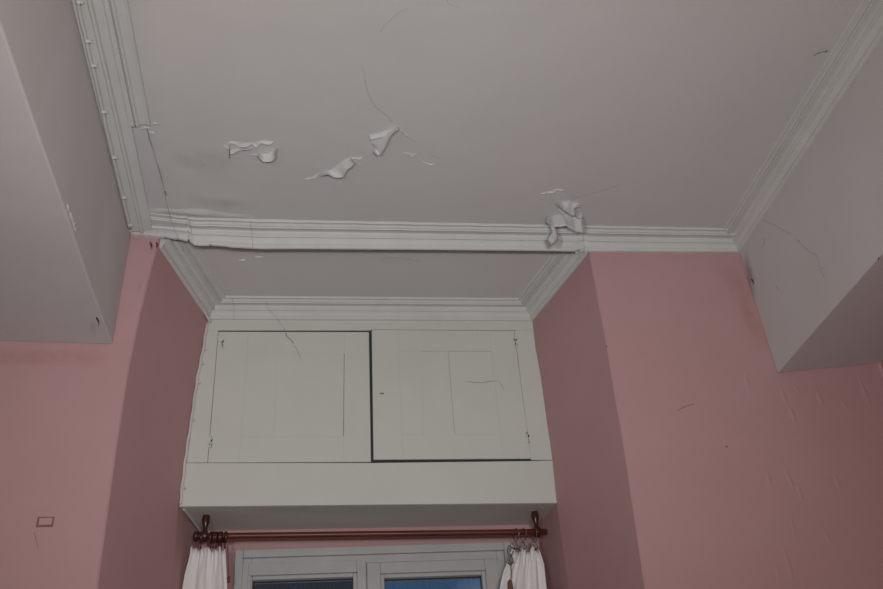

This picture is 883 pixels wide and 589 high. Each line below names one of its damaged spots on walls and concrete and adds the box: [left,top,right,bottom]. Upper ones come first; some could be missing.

peeling [223,140,278,162]
peeling [302,157,362,180]
peeling [485,189,584,252]
flaking render [164,238,339,262]